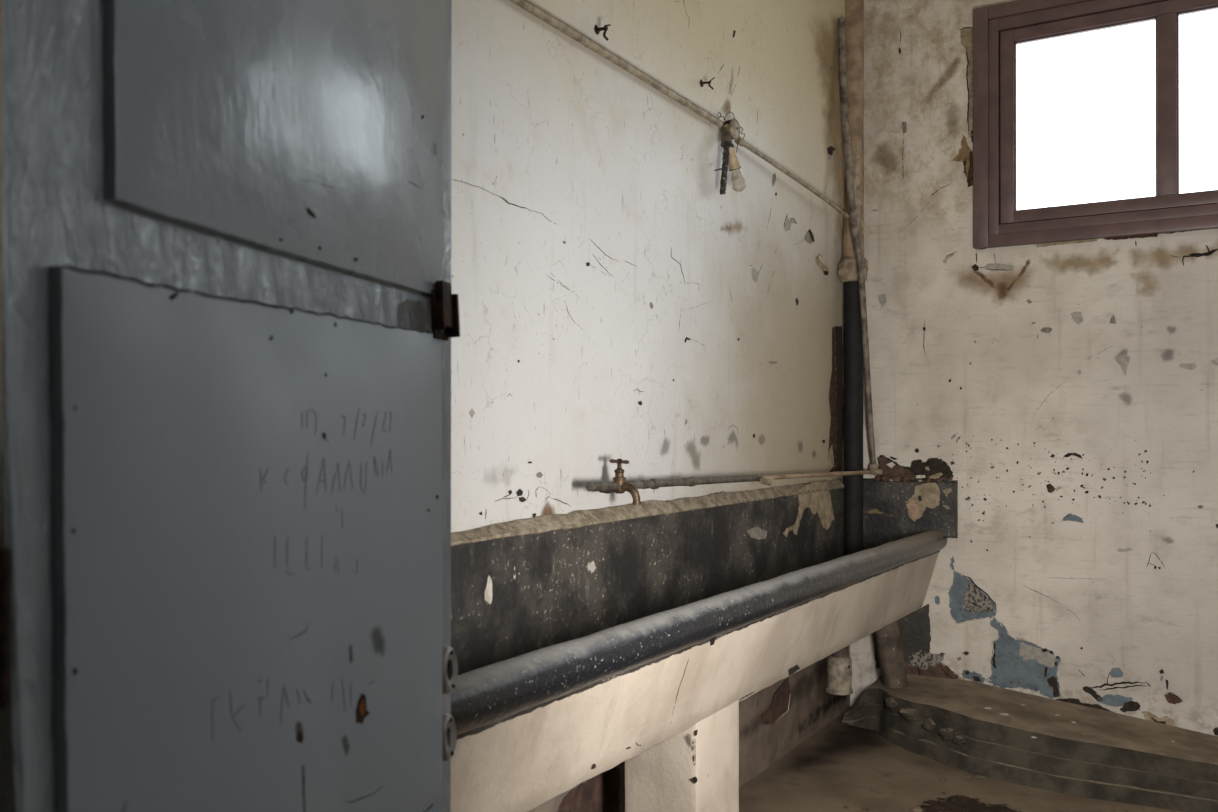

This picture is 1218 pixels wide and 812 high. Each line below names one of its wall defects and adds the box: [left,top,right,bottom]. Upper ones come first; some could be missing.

flaking render [952,27,973,187]
crack [455,180,558,225]
damp [1055,257,1109,269]
flaking render [783,326,843,537]
flaking render [877,436,1151,524]
flaking render [746,526,768,540]
peeling [905,557,1183,735]
peeling [557,764,620,812]